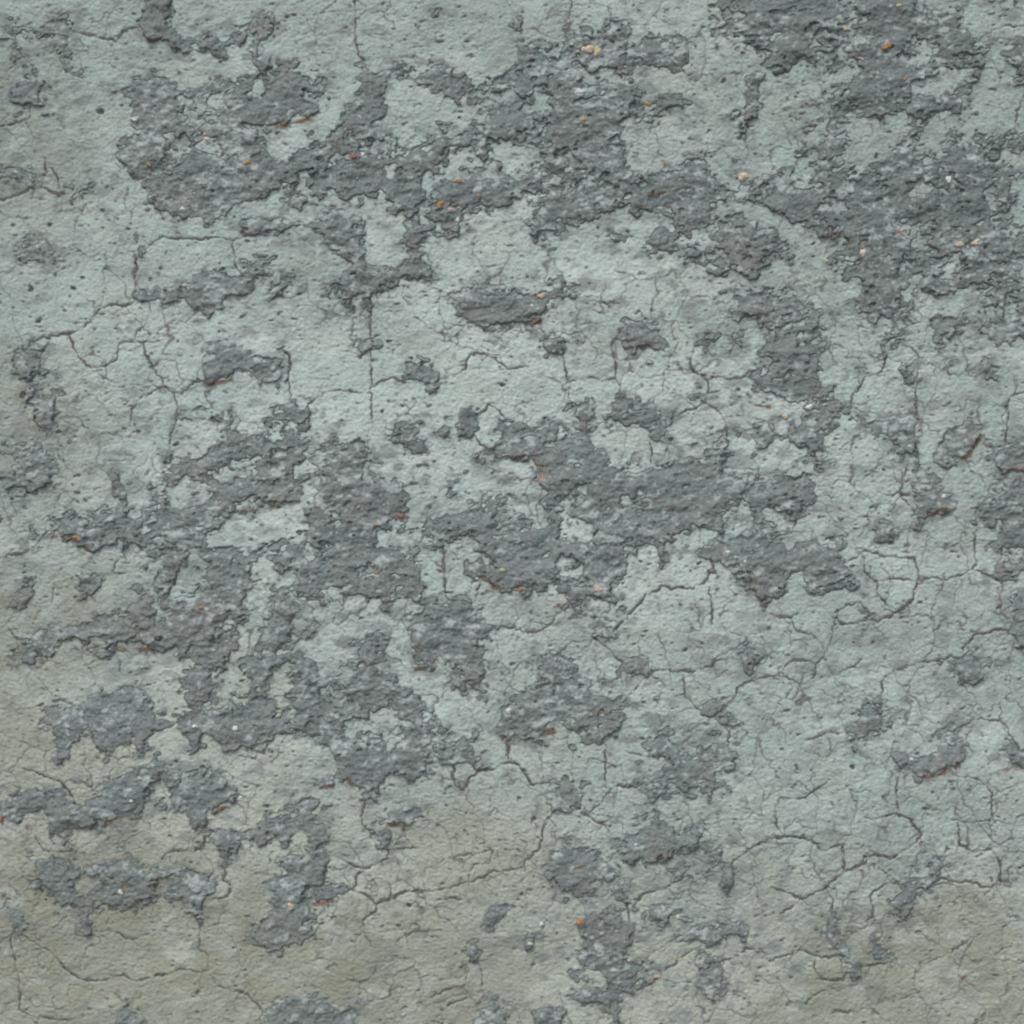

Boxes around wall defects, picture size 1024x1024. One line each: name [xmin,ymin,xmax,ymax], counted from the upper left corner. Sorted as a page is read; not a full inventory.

spalling [113,0,1024,474]
spalling [0,343,72,500]
crack [25,235,248,451]
crack [281,298,404,444]
spalling [874,474,958,543]
spalling [0,397,866,850]
crack [556,524,1015,746]
crack [451,740,549,791]
spalling [29,847,218,936]
crack [328,814,552,948]
spalling [529,699,755,1024]
crack [731,777,923,935]